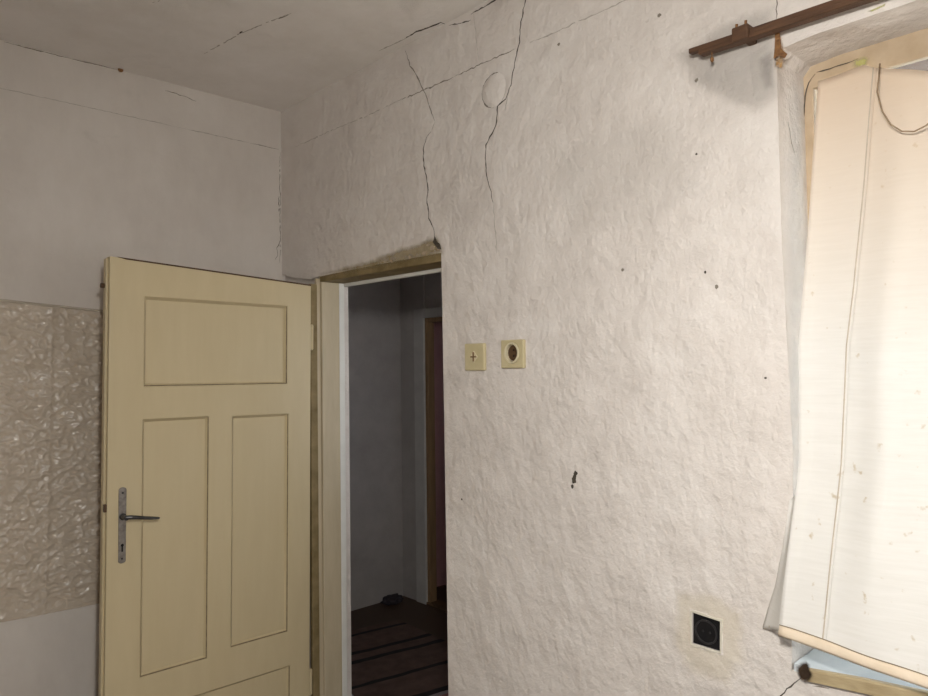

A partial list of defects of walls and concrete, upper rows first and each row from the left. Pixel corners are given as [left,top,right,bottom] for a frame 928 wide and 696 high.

crack [1,0,626,258]